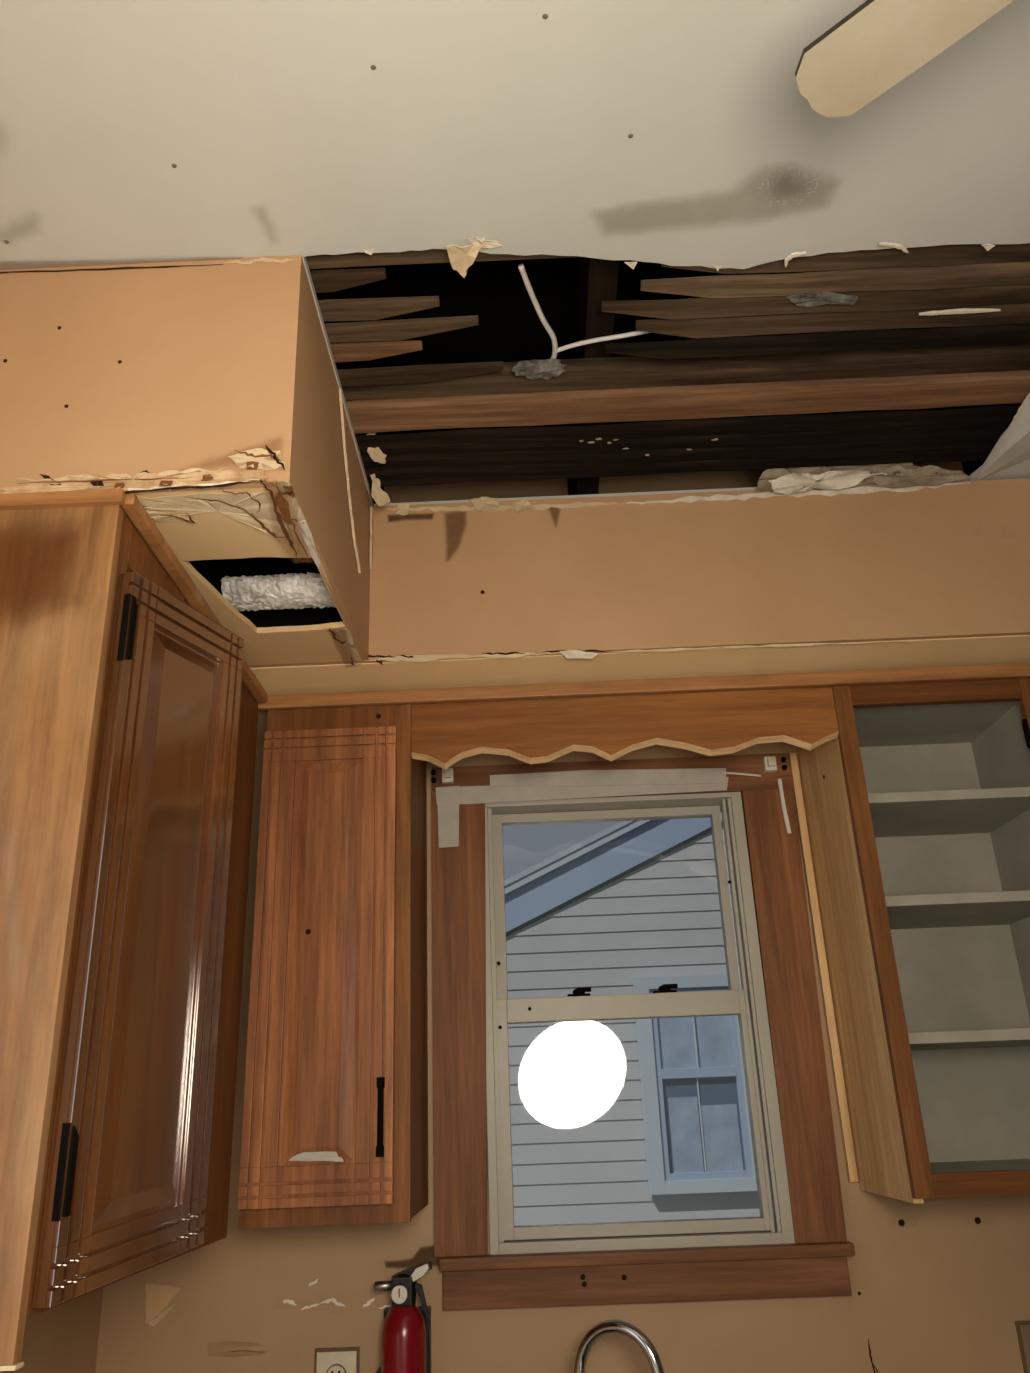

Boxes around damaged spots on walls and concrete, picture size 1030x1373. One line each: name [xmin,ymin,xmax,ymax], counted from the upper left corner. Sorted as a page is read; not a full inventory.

peeling [446,237,503,277]
peeling [0,448,320,571]
crack [31,445,309,558]
spalling [384,463,972,516]